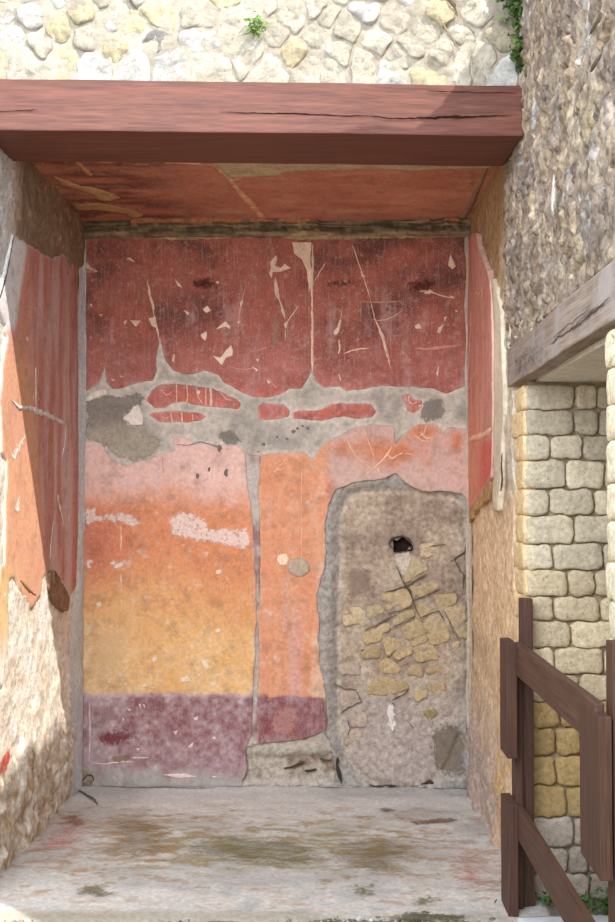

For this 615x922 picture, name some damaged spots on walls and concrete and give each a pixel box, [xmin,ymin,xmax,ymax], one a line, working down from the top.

flaking render [0,148,143,322]
flaking render [85,339,467,466]
flaking render [214,163,518,849]
crack [361,562,459,651]
crack [430,542,466,588]
flaking render [0,570,94,874]
crack [334,684,362,735]